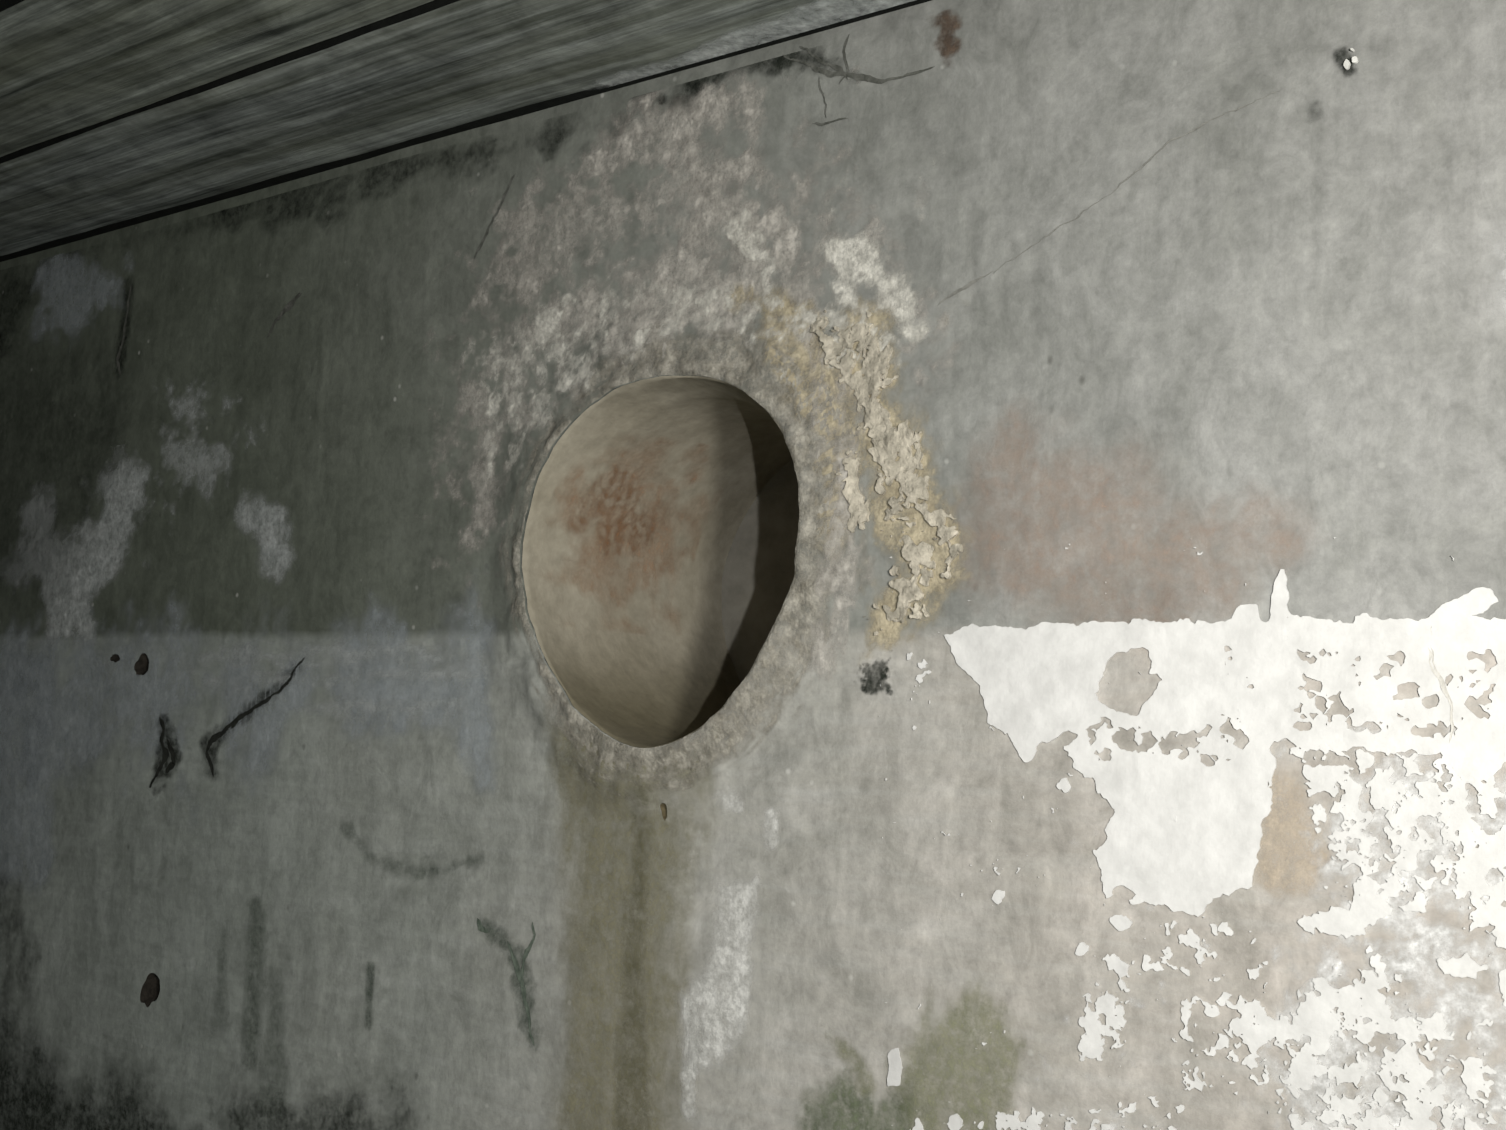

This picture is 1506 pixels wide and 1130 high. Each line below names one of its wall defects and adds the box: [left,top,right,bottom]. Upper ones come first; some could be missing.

leakage [436,81,947,547]
leakage [813,440,858,674]
crack [149,658,305,788]
leakage [555,732,759,1130]
leakage [765,809,779,849]
peeling [730,287,1506,1130]
leakage [0,1044,168,1130]